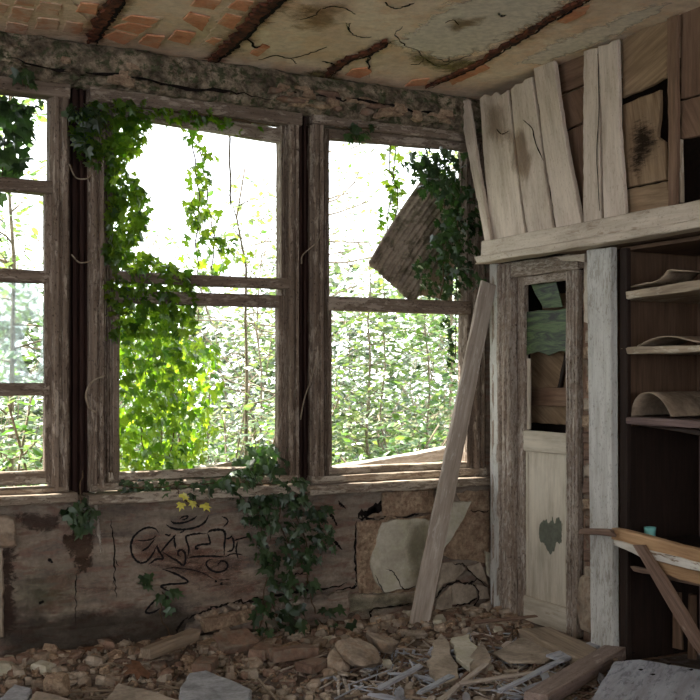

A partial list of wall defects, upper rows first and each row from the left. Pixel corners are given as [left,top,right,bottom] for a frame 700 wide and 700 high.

flaking render [0,0,99,36]
flaking render [99,0,257,49]
crack [204,0,590,89]
crack [9,57,272,100]
crack [316,94,447,117]
crack [110,523,119,597]
crack [436,563,487,607]
crack [369,603,409,618]